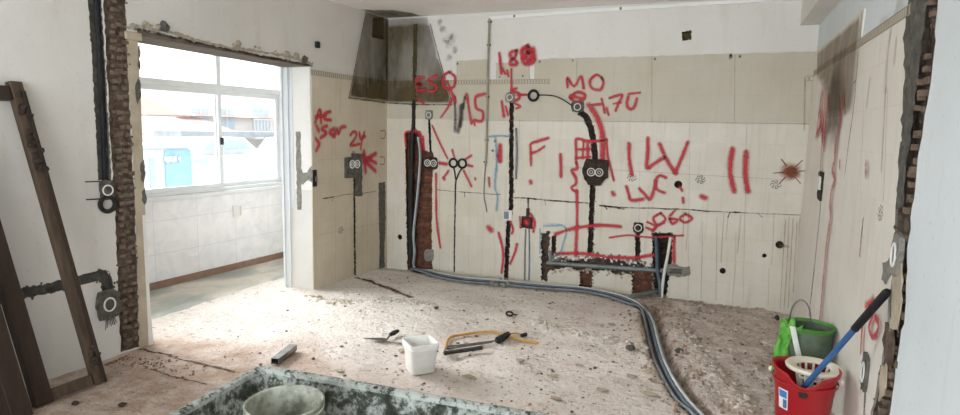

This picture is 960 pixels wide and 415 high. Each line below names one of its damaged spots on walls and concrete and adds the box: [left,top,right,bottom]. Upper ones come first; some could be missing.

spalling [124,20,313,104]
water stain [817,22,858,130]